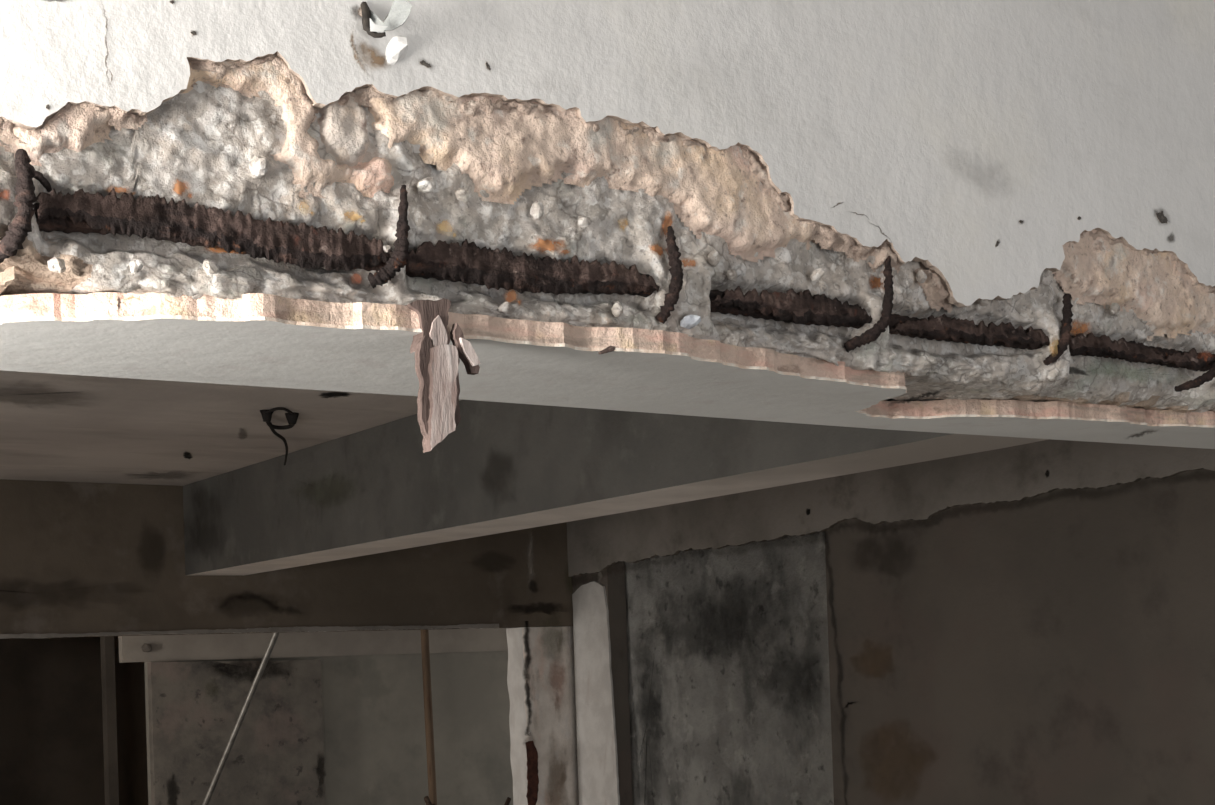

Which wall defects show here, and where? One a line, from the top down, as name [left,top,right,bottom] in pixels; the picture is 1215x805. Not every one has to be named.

crack [104,10,113,81]
corrosion [173,179,192,198]
corrosion [534,239,569,254]
spalling [0,54,1215,413]
corrosion [651,214,673,255]
crack [523,621,532,736]